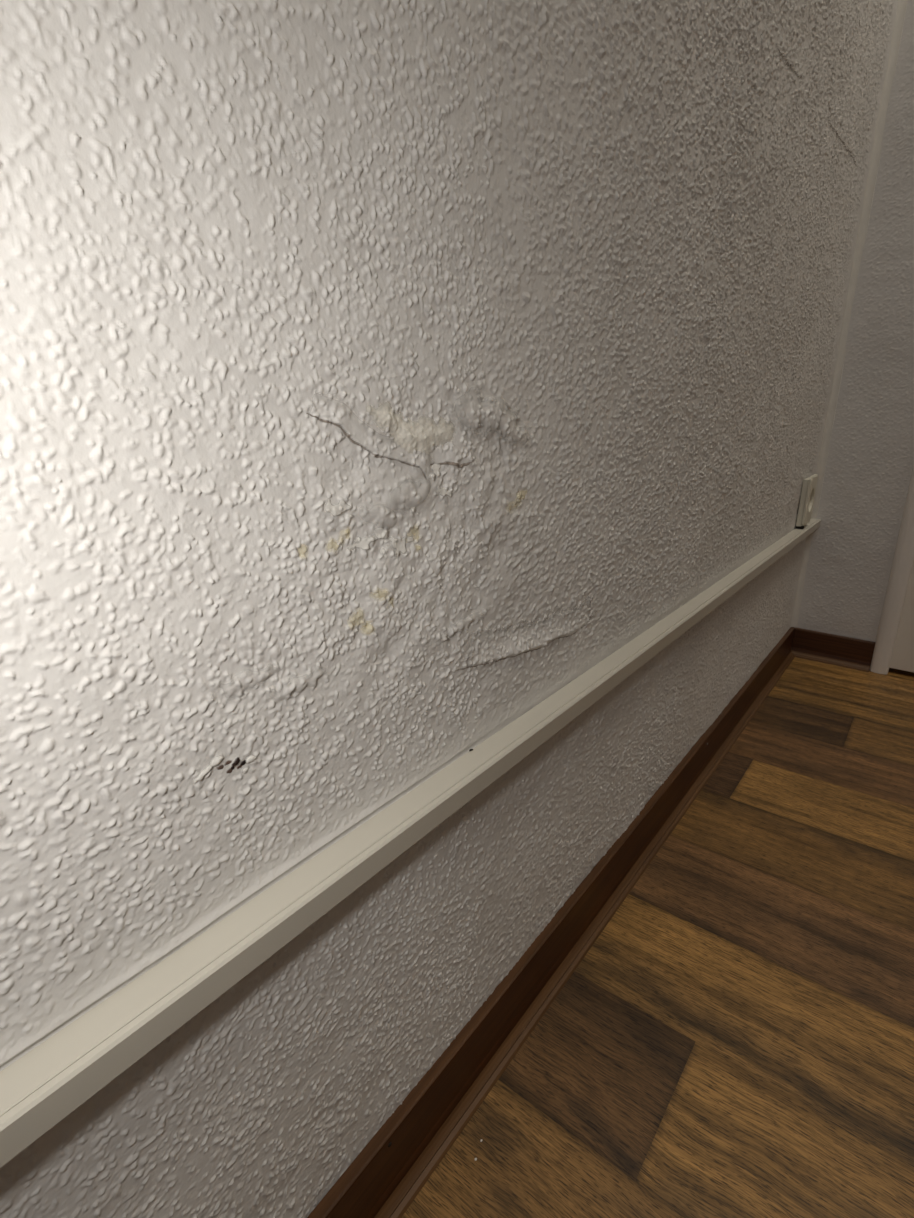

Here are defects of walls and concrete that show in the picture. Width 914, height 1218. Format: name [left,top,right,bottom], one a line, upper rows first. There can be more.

crack [306,395,472,481]